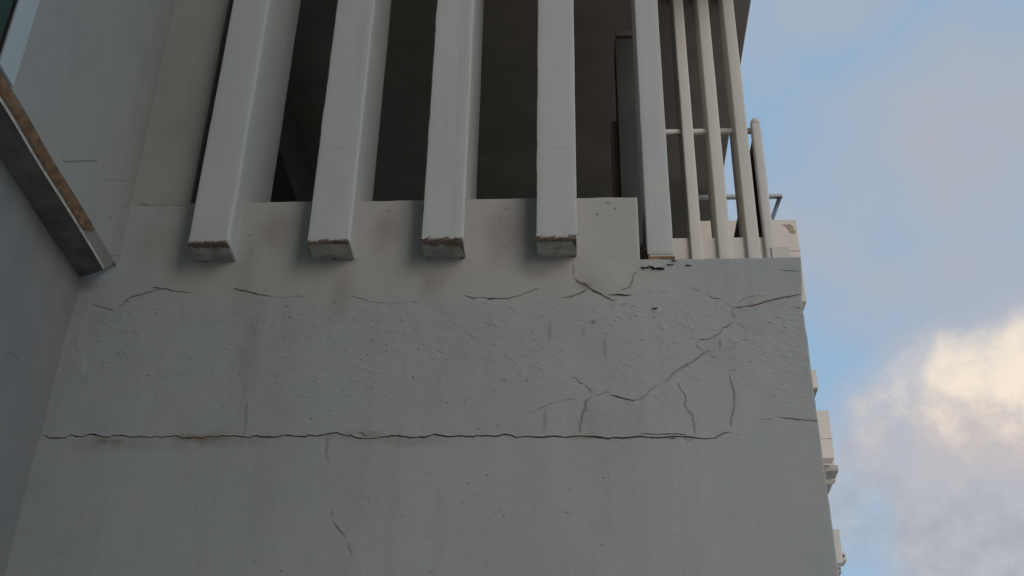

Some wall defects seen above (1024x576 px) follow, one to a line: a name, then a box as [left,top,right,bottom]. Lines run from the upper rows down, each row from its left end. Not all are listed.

crack [94,287,192,310]
crack [465,288,537,300]
crack [564,277,662,300]
crack [697,270,803,359]
crack [45,377,727,440]
crack [782,414,818,422]